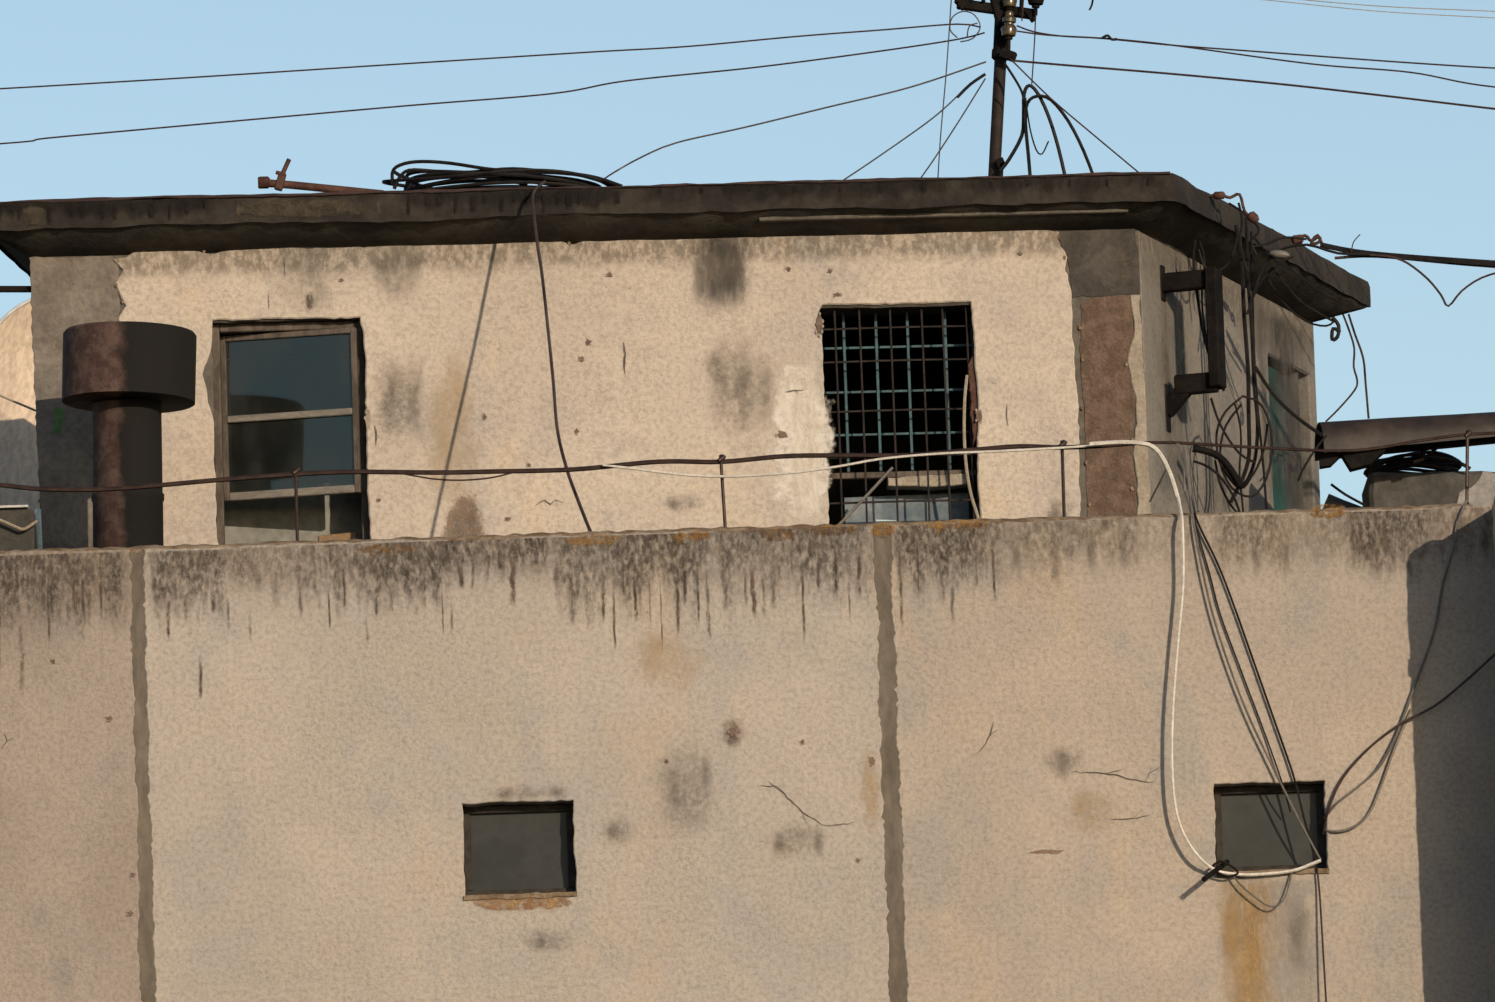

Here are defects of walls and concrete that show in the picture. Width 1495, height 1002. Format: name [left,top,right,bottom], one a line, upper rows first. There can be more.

leakage [702,237,742,297]
leakage [0,552,122,635]
leakage [153,549,251,636]
leakage [303,497,997,644]
leakage [1340,508,1443,564]